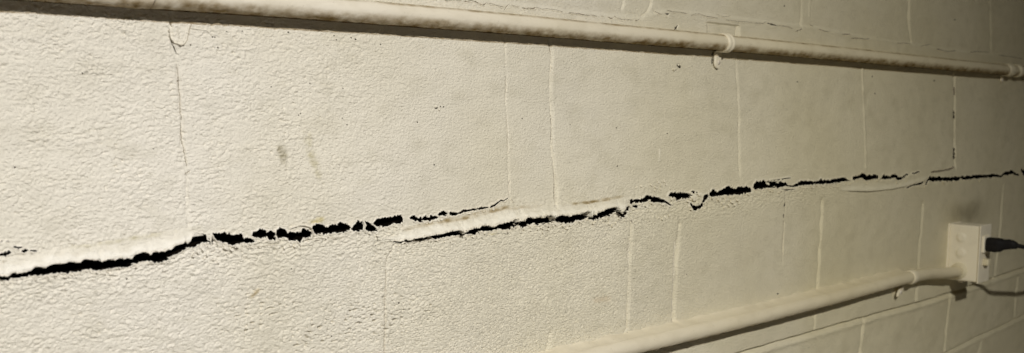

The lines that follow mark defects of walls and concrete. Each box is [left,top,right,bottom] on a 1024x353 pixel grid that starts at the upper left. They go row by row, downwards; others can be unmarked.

crack [169,21,190,174]
crack [0,148,1024,353]